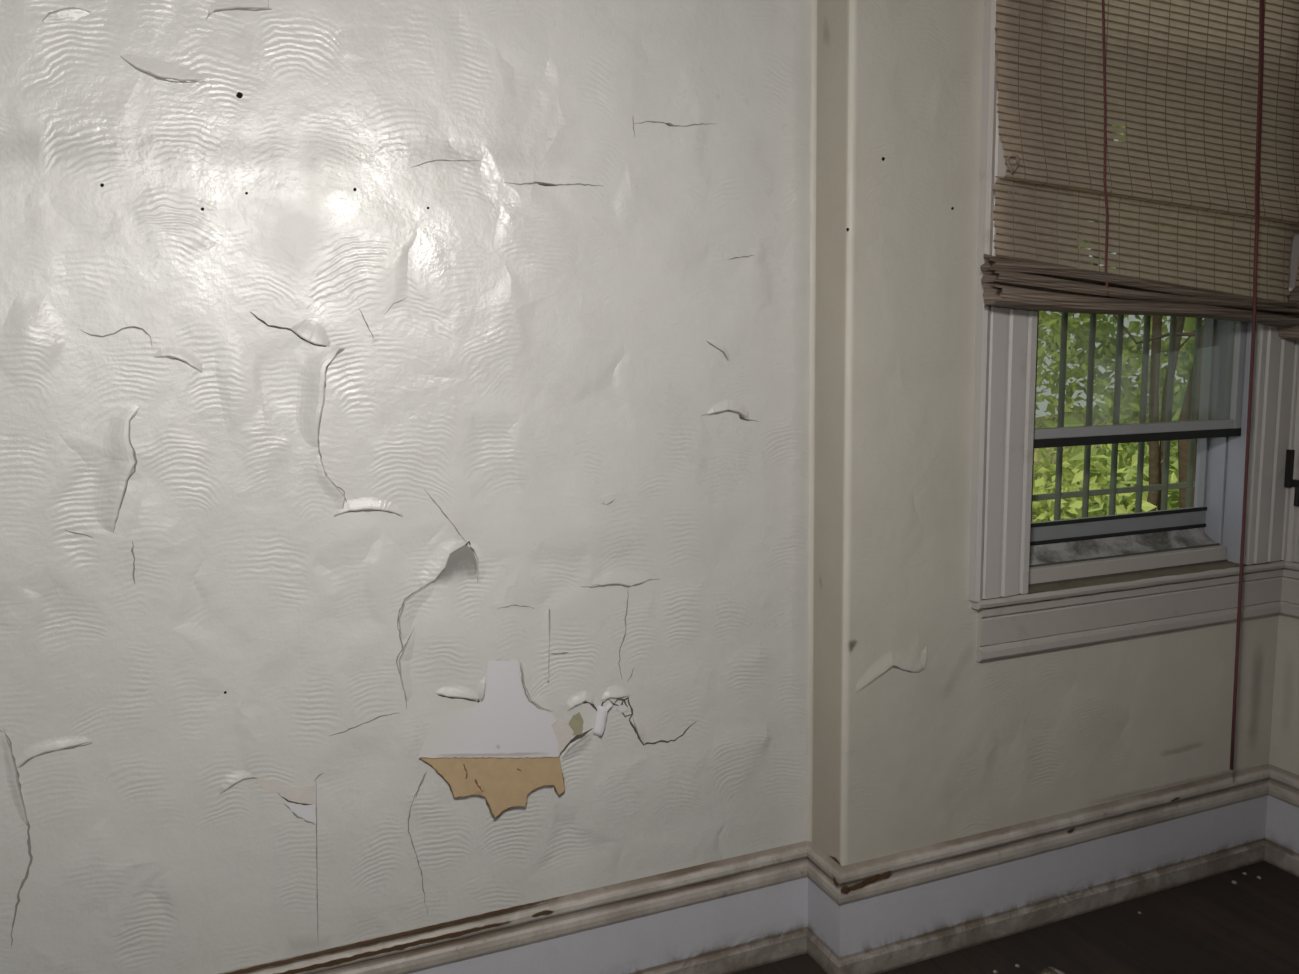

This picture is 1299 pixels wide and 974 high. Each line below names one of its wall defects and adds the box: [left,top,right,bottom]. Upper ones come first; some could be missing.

crack [42,7,91,24]
crack [206,0,272,20]
crack [120,54,205,83]
crack [633,119,706,135]
crack [504,179,602,187]
crack [81,326,203,373]
crack [250,298,465,540]
crack [702,399,759,422]
crack [580,567,697,746]
peeling [418,660,613,818]
crack [0,729,92,946]
peeling [219,770,323,934]